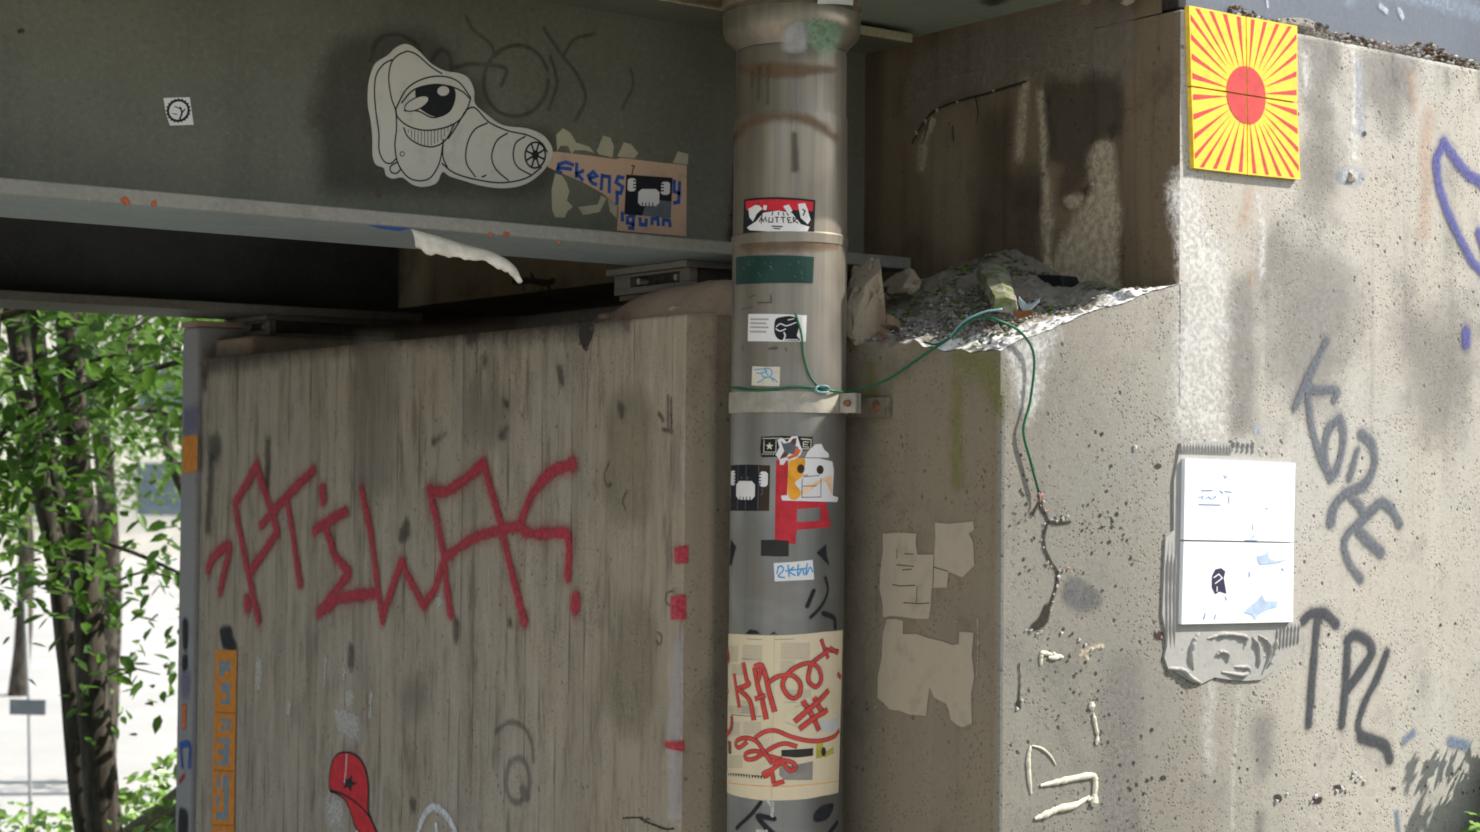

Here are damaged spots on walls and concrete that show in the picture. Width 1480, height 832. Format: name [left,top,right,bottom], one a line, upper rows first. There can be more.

spalling [847,257,921,346]
peeling [935,142,1161,350]
crack [1016,492,1071,711]